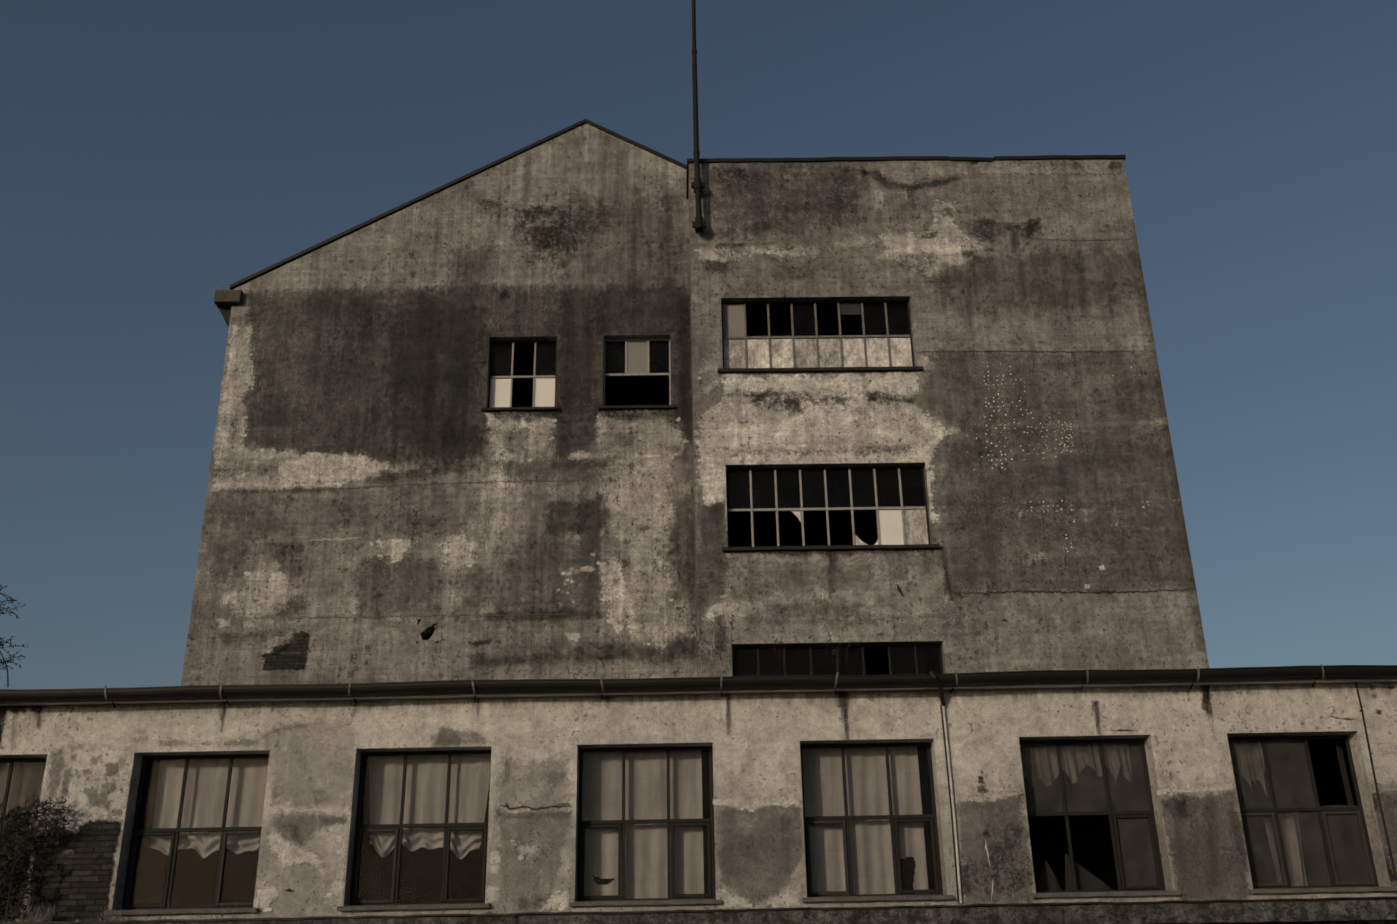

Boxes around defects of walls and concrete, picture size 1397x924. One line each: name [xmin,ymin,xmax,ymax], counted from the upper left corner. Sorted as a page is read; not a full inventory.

peeling [211,325,431,493]
peeling [436,411,557,571]
peeling [368,537,415,563]
peeling [217,559,310,672]
spalling [389,588,494,643]
damp [0,705,47,749]
flaking render [28,736,267,922]
damp [717,807,803,906]